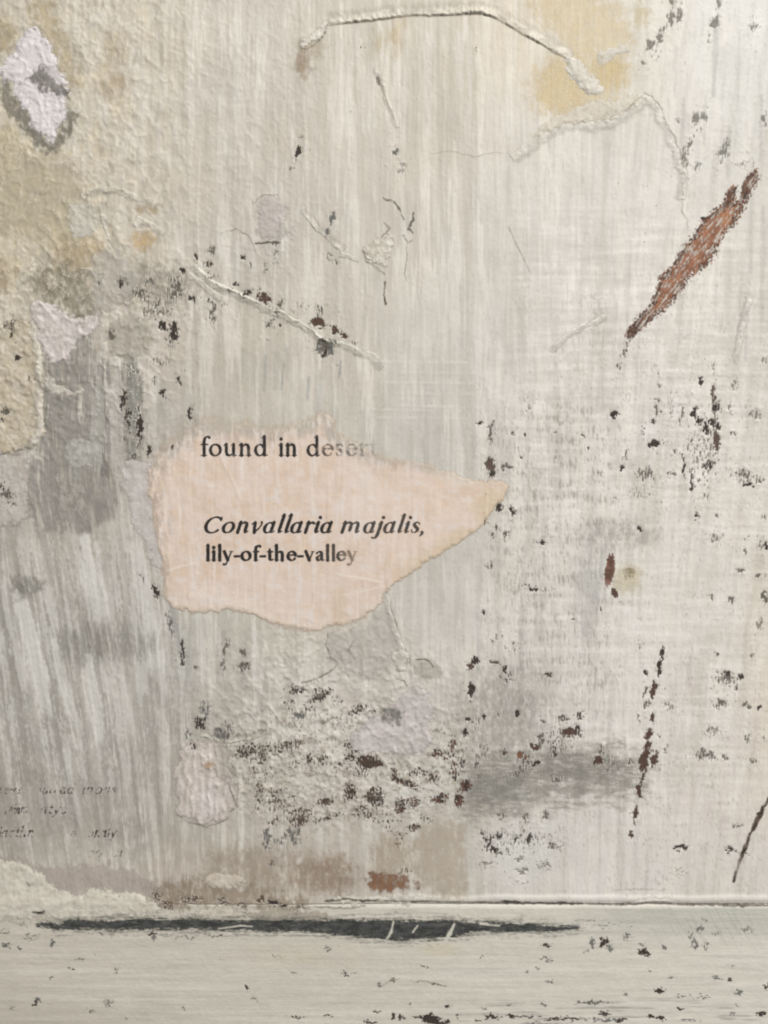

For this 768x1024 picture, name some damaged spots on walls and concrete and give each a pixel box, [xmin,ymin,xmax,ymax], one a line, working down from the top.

water stain [528,0,647,113]
crack [299,1,690,200]
peeling [283,684,376,723]
peeling [466,656,512,702]
peeling [172,701,498,849]
peeling [500,711,584,777]
rust [368,872,419,892]